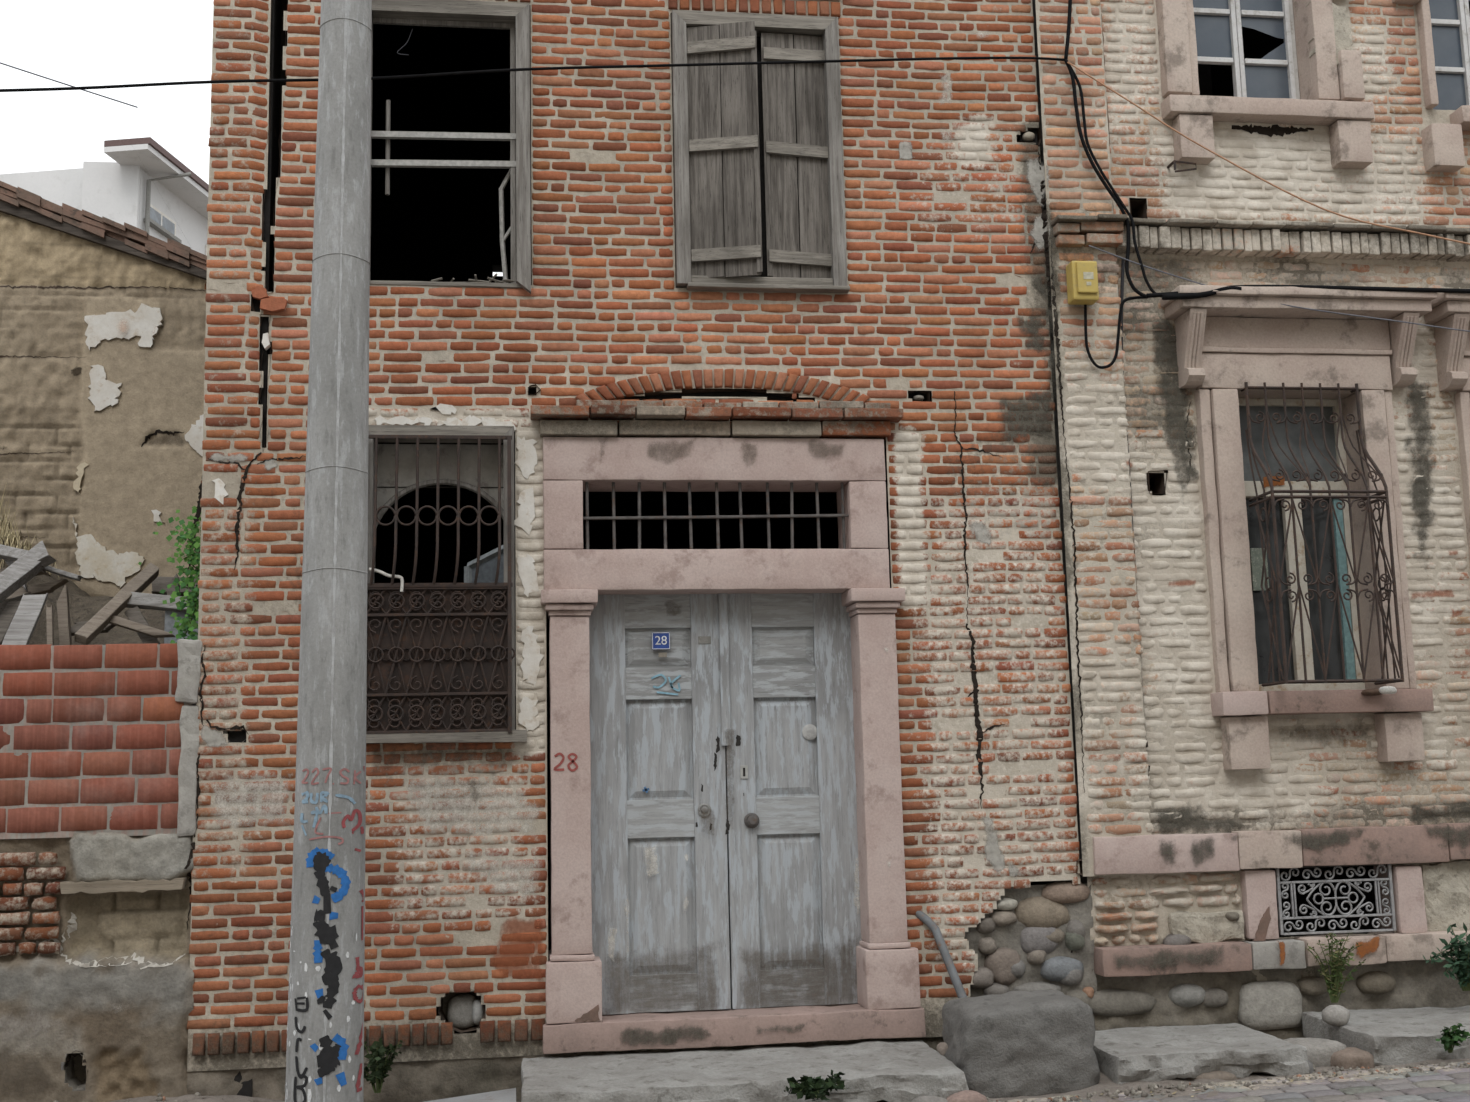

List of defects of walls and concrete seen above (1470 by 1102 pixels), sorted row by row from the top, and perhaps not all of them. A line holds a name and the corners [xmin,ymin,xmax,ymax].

crack [188,0,305,570]
peeling [84,303,163,412]
peeling [141,414,204,456]
leakage [1153,320,1198,487]
leakage [1406,381,1434,551]
peeling [73,517,145,589]
crack [954,391,1005,809]
leakage [1158,808,1242,864]
leakage [1293,830,1363,850]
leakage [1412,802,1470,848]